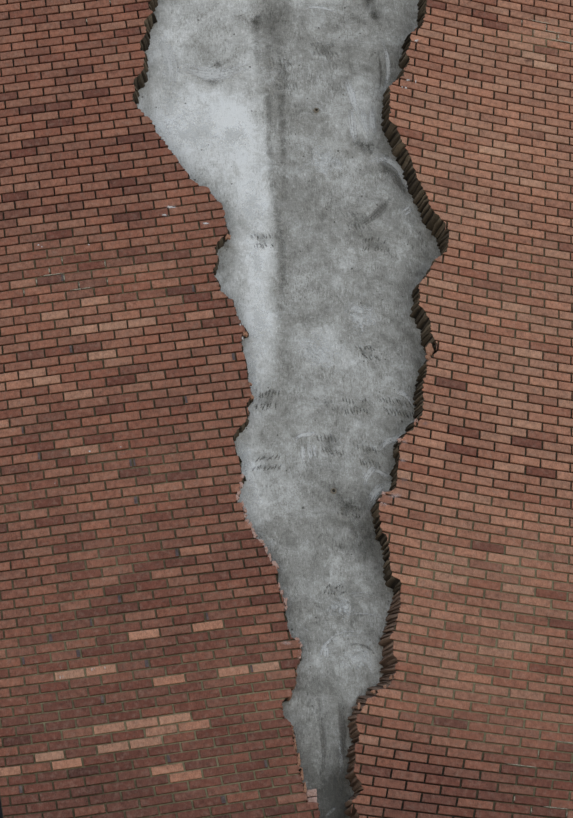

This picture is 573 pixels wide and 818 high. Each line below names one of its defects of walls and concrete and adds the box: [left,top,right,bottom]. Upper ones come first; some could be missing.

spalling [425,343,434,360]
spalling [236,473,279,569]
spalling [291,726,317,803]